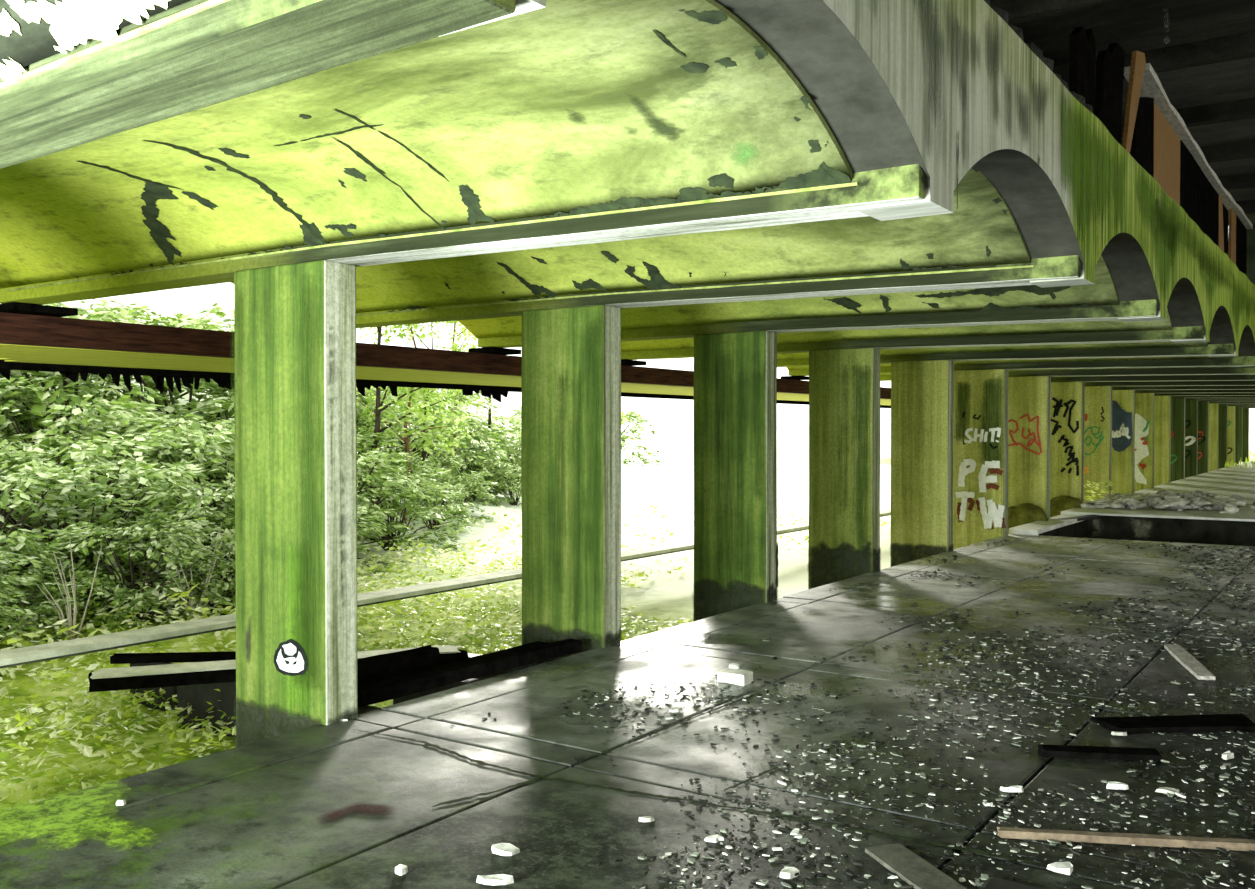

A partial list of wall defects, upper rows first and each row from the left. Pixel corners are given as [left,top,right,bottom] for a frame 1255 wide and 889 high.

peeling [0,0,170,54]
crack [653,30,686,58]
leakage [919,0,1045,154]
crack [77,161,182,190]
crack [146,141,327,244]
crack [274,109,449,230]
peeling [459,185,497,225]
peeling [538,140,851,219]
leakage [1062,100,1254,333]
leakage [693,374,778,621]
leakage [808,368,954,589]
spalling [1039,515,1255,547]